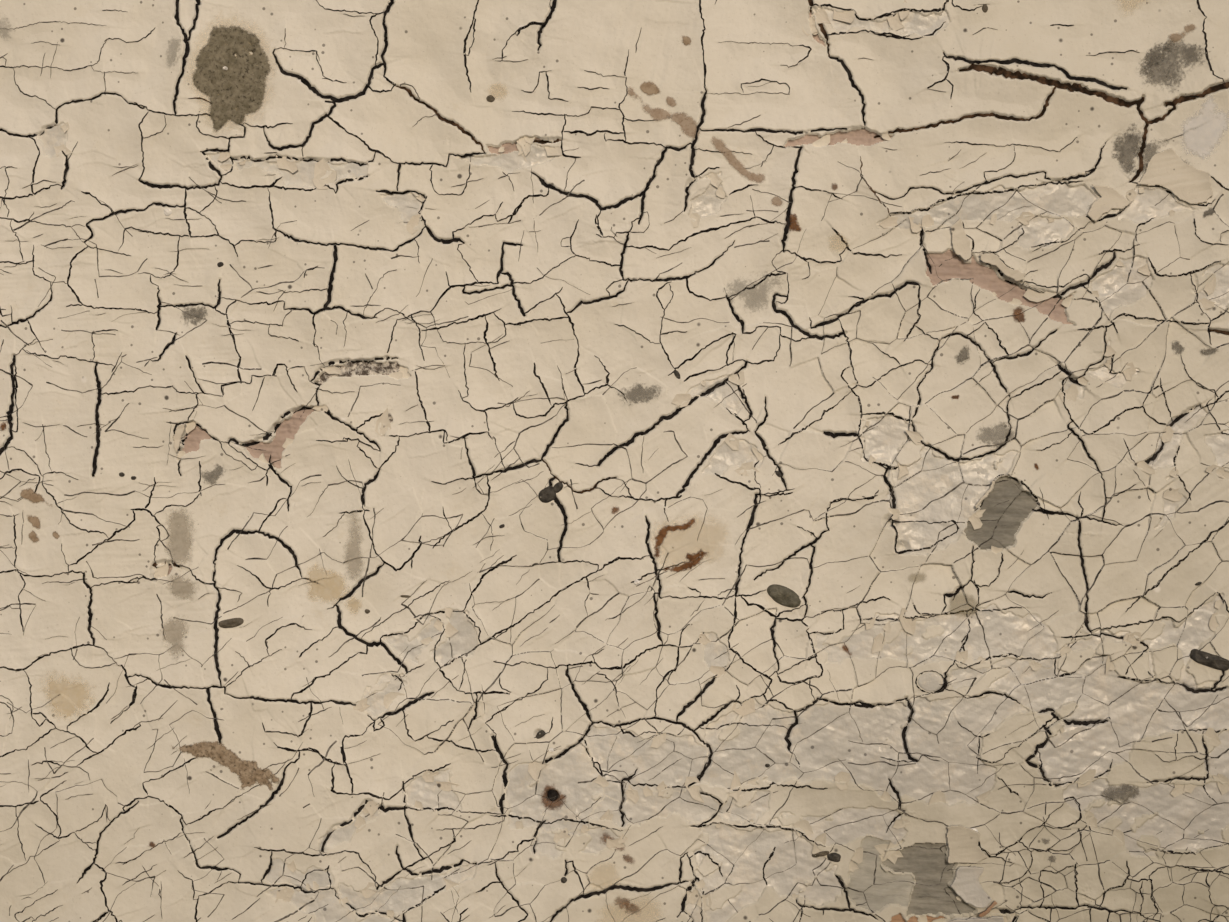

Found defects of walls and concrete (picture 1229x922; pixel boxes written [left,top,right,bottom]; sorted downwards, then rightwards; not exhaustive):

crack [808,0,1229,194]
peeling [461,136,562,173]
crack [860,137,1107,217]
crack [998,218,1153,298]
peeling [169,381,330,468]
peeling [0,471,225,546]
peeling [173,474,463,624]
peeling [257,148,1229,922]
crack [889,518,959,554]
crack [853,546,1101,704]
crack [1118,639,1227,693]
corrosion [542,786,565,810]